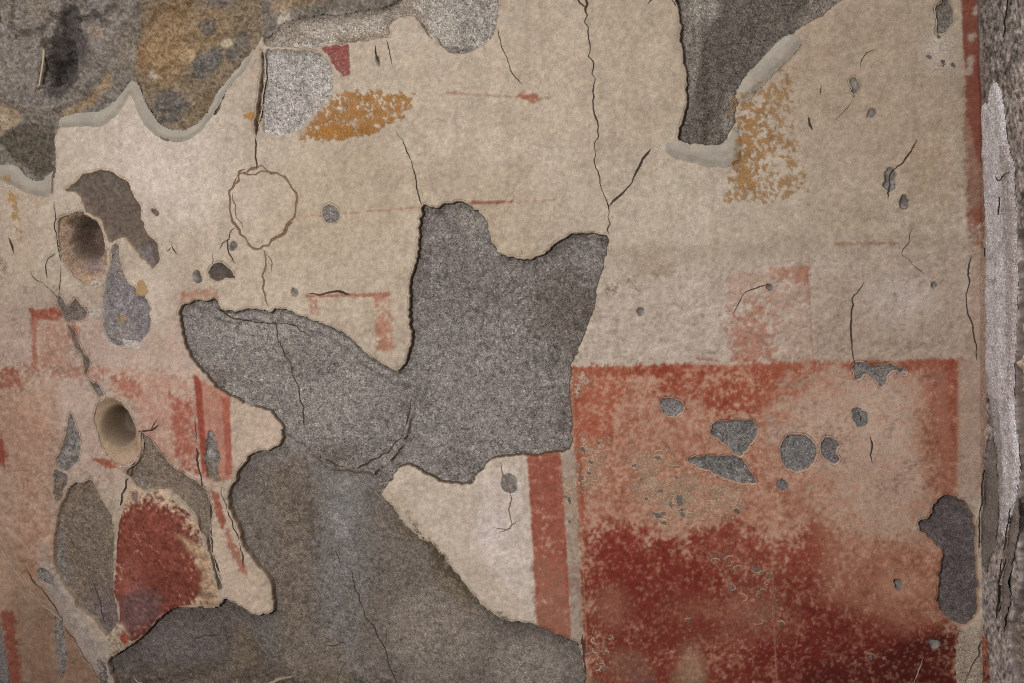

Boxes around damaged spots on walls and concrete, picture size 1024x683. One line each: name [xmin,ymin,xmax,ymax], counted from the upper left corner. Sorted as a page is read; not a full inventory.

crack [578,0,651,233]
spalling [673,0,844,146]
spalling [848,76,862,97]
spalling [0,0,614,683]
crack [212,139,415,469]
spalling [777,433,841,490]
spalling [917,436,999,629]